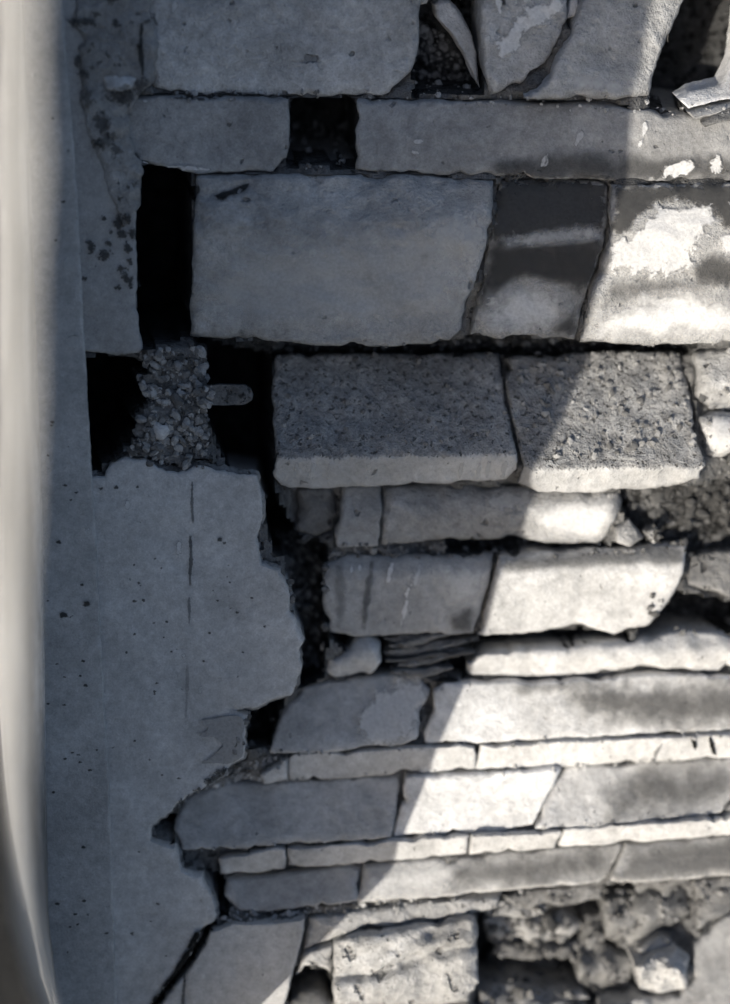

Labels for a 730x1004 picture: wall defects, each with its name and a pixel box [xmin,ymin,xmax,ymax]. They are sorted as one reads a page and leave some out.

spalling [127,345,216,471]
spalling [173,763,253,814]
crack [150,922,216,1004]